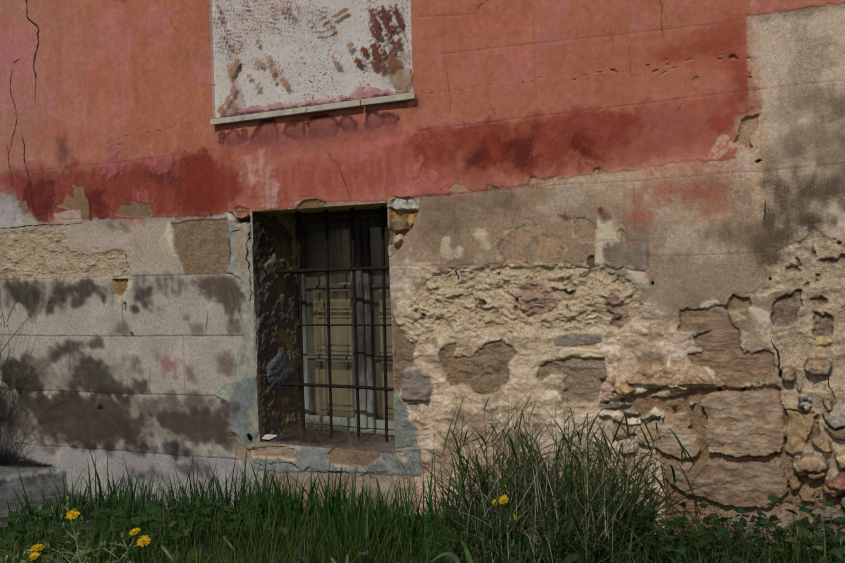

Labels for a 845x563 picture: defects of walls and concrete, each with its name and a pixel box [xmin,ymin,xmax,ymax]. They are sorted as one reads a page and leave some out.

peeling [346,4,406,72]
crack [1,0,83,229]
damp [3,279,114,316]
spalling [0,228,138,296]
damp [0,140,241,228]
damp [218,98,399,208]
peeling [218,55,406,115]
spalling [388,197,420,258]
spalling [399,217,648,359]
damp [745,170,845,260]
damp [0,334,237,476]
spalling [598,226,845,546]